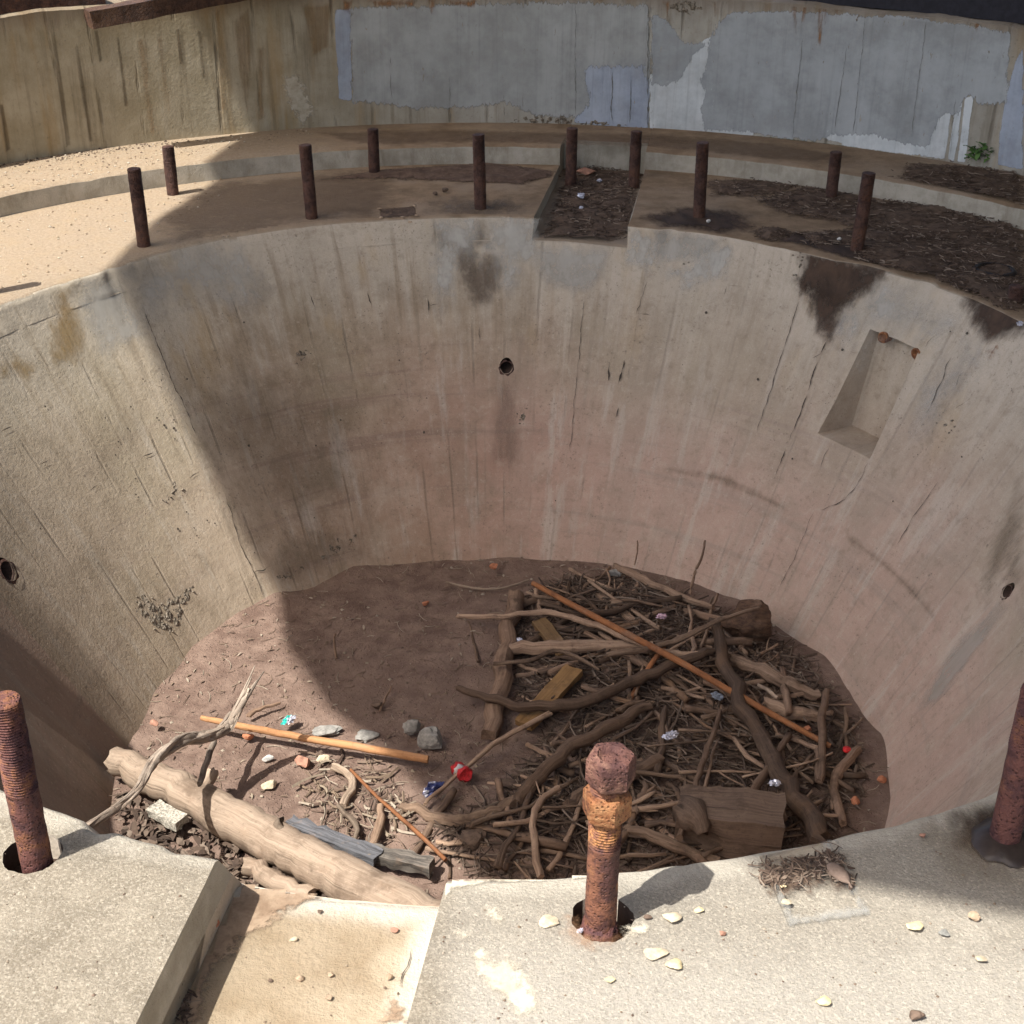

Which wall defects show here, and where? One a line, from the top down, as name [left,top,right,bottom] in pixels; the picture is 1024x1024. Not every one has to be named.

peeling [335,0,1024,169]
water stain [437,201,532,301]
crack [757,305,798,430]
crack [776,336,830,473]
water stain [781,232,887,336]
water stain [968,298,1023,339]